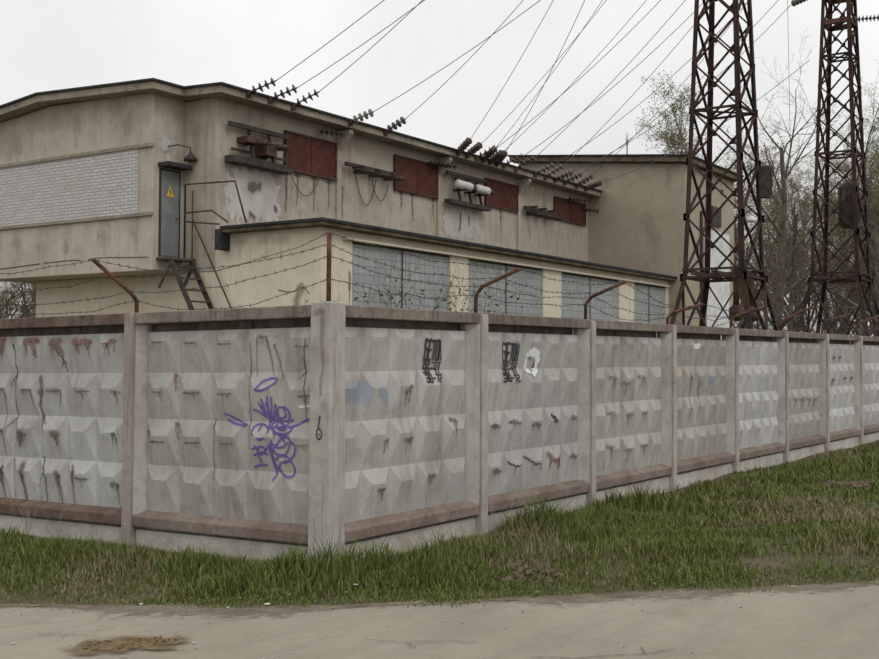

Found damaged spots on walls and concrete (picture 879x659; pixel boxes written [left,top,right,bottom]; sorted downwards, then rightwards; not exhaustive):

rust [23,337,64,358]
crack [1,344,20,446]
rust [39,379,59,442]
rust [0,459,27,504]
crack [39,456,48,505]
rust [53,465,75,507]